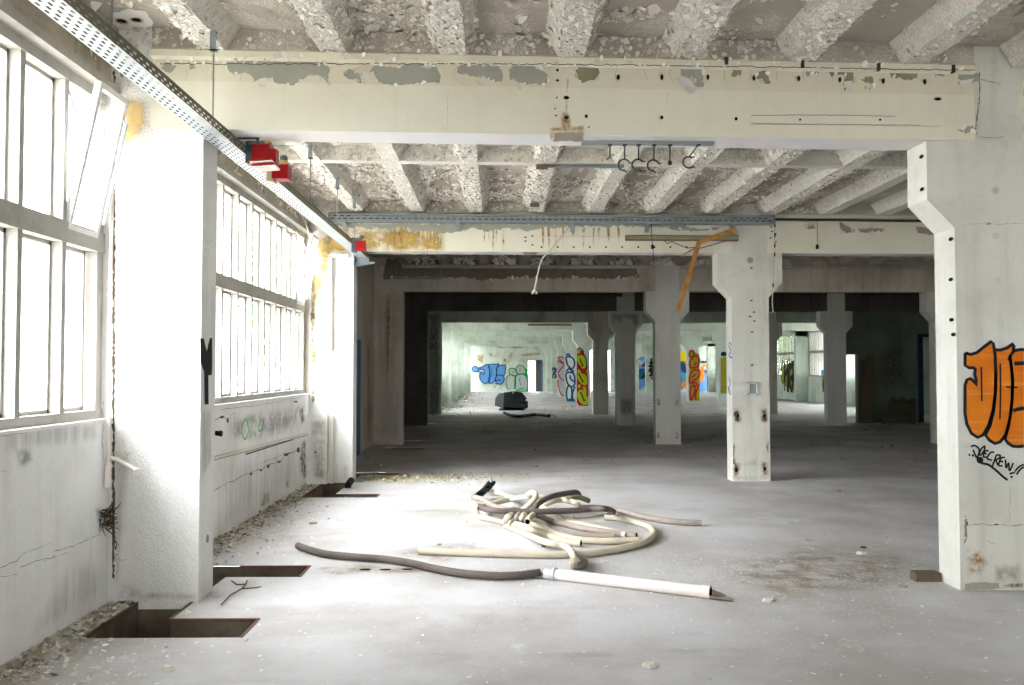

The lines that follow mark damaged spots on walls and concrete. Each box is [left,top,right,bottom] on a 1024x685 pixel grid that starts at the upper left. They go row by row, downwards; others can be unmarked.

peeling [90,0,1024,94]
water stain [125,103,144,142]
crack [959,72,1000,138]
peeling [273,132,908,235]
crack [1,165,128,579]
crack [216,447,304,490]
crack [966,487,1023,544]